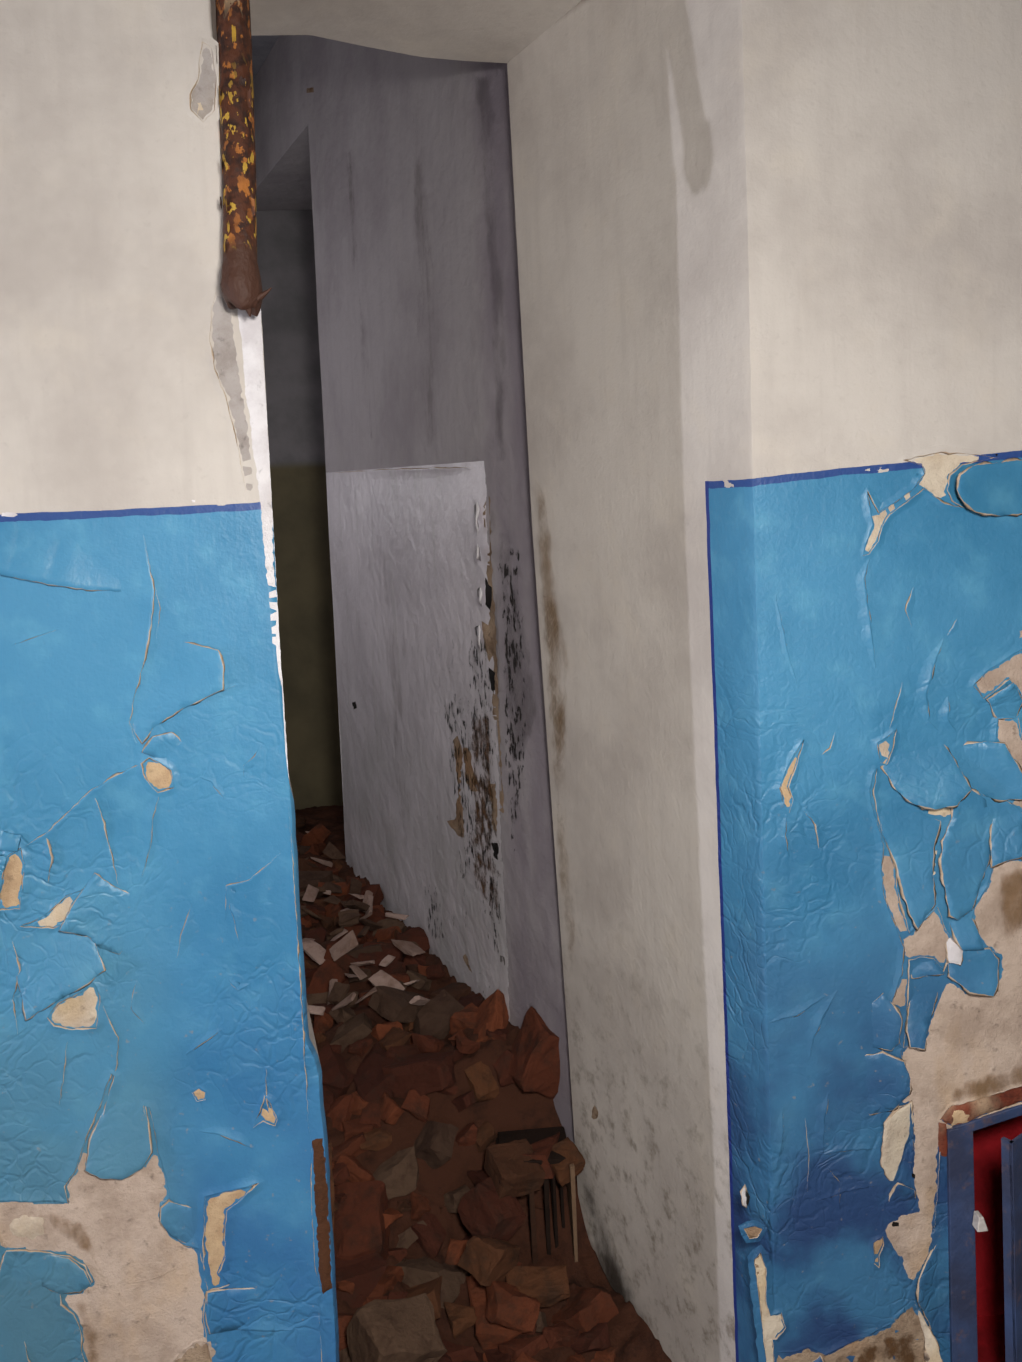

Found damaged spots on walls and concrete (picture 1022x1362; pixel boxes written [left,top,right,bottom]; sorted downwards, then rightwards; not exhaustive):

flaking render [205,288,289,777]
peeling [859,445,1022,561]
mould [444,551,526,952]
peeling [0,830,130,1036]
peeling [0,1064,266,1362]
peeling [251,1092,284,1131]
peeling [738,630,1022,1362]